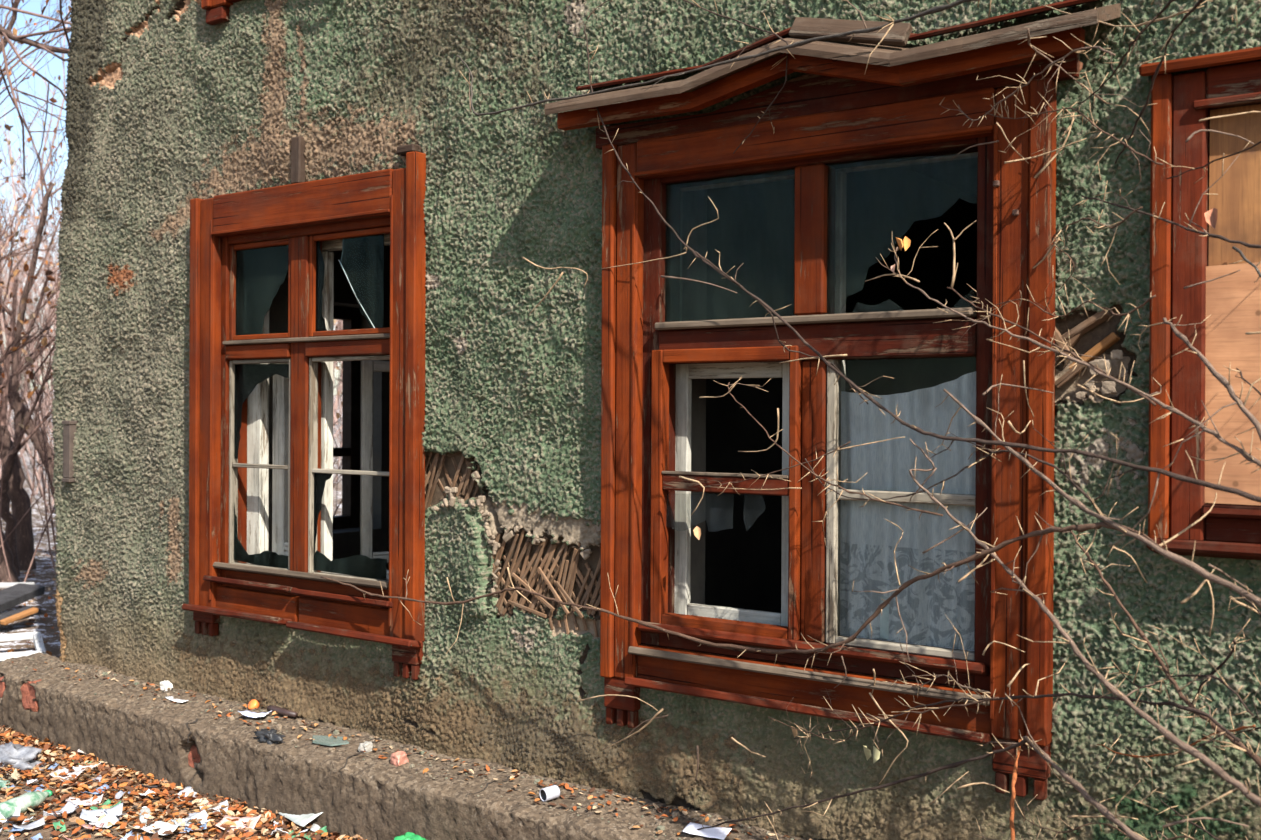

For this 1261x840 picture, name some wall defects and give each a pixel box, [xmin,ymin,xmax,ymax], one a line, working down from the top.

crack [87,0,201,89]
spalling [1055,304,1137,415]
spalling [1060,418,1146,490]
spalling [425,451,601,653]
spalling [0,676,41,713]